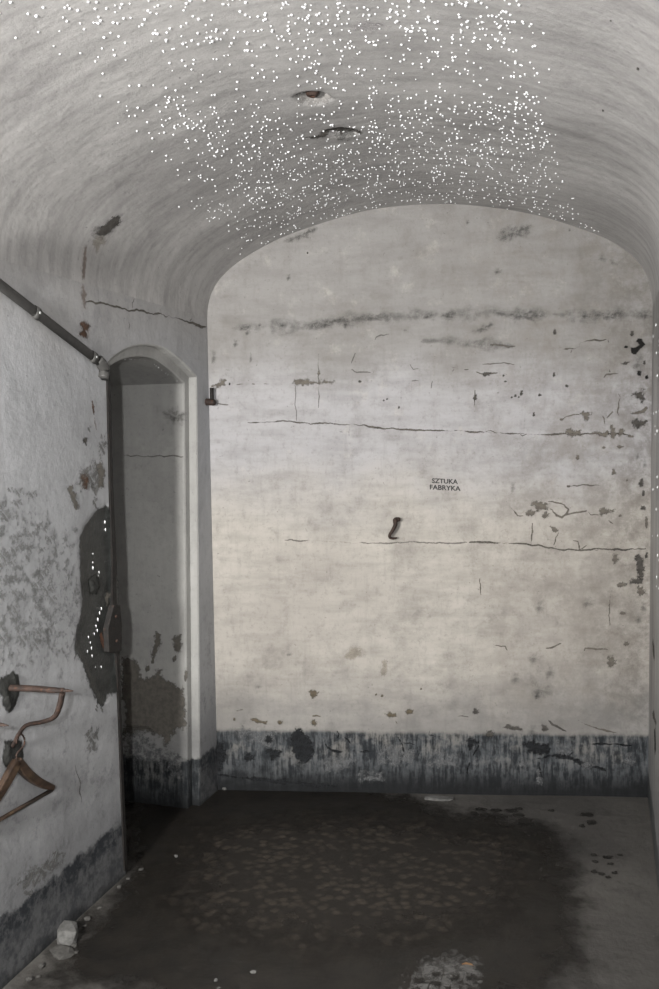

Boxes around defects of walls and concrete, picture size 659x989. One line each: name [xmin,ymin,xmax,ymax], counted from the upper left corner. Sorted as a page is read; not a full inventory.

crack [86,300,206,329]
spalling [292,368,334,408]
crack [248,370,627,436]
crack [567,484,621,524]
crack [361,540,646,551]
peeling [67,435,188,747]
peeling [85,727,99,752]
water stain [33,731,587,989]